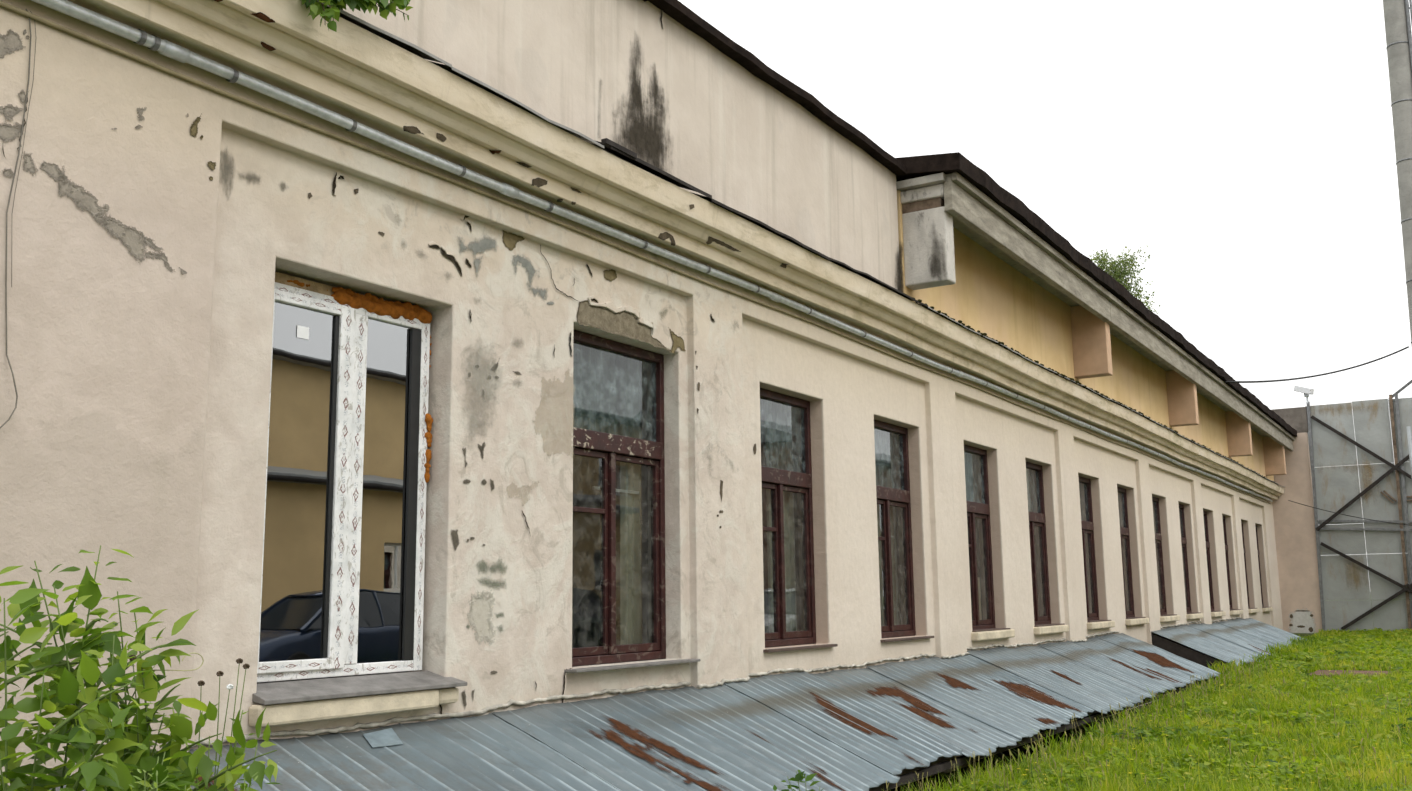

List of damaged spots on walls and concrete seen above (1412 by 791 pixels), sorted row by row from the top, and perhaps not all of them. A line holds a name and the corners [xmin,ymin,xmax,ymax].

spalling [0,29,29,58]
water stain [618,44,667,177]
spalling [0,90,187,274]
spalling [503,230,525,251]
spalling [577,296,700,391]
rust [588,716,727,791]
rust [810,692,922,764]
rust [867,686,955,728]
rust [933,671,1083,724]